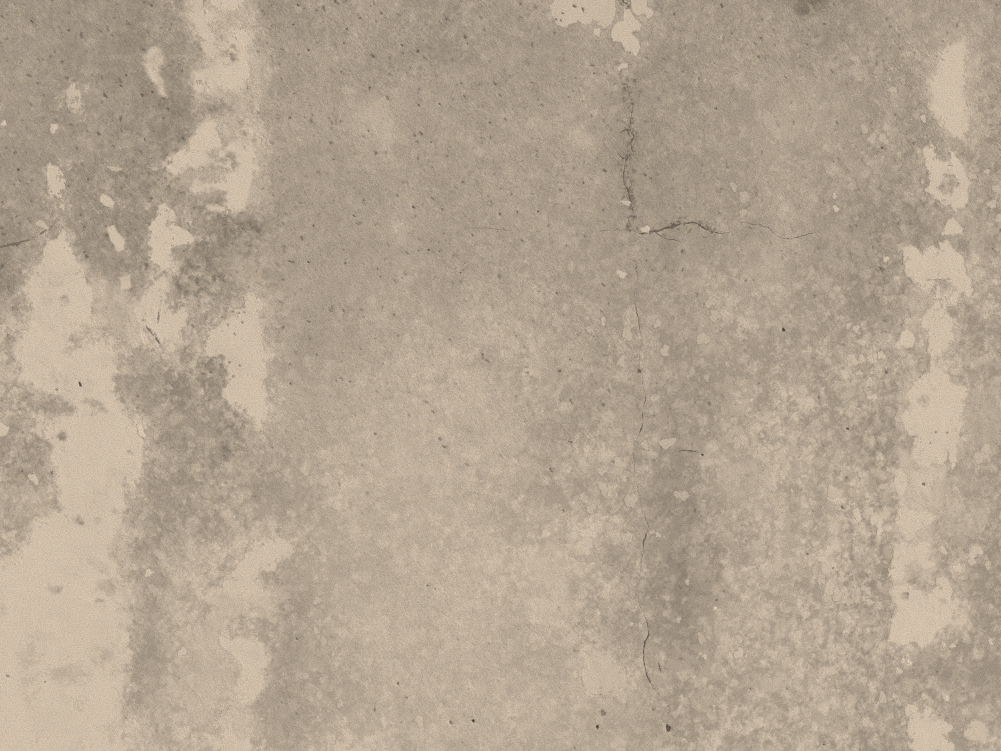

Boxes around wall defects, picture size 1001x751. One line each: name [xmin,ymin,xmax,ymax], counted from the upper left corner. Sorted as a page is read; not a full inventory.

peeling [46,162,68,211]
peeling [100,193,116,208]
peeling [118,201,196,348]
peeling [160,0,267,218]
peeling [549,0,656,72]
crack [620,93,722,241]
peeling [899,33,976,468]
peeling [201,288,272,426]
peeling [0,224,148,751]
peeling [841,500,961,650]
crack [638,592,670,713]
peeling [905,703,989,751]